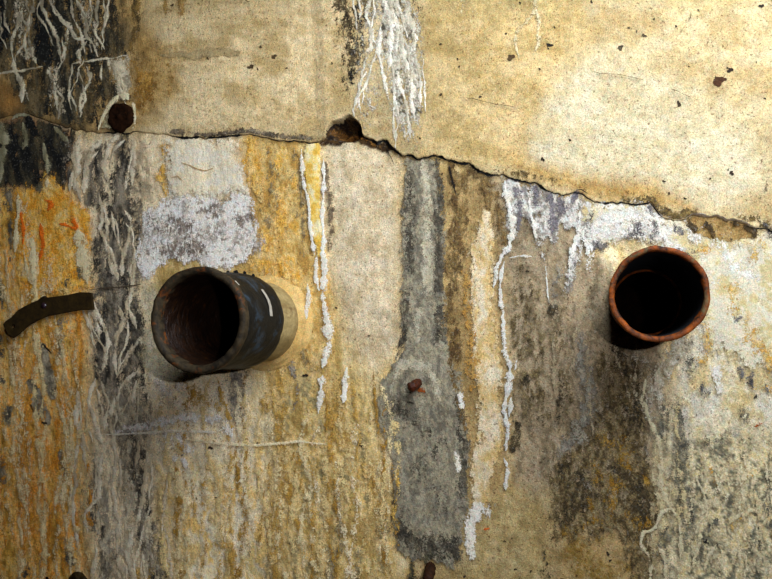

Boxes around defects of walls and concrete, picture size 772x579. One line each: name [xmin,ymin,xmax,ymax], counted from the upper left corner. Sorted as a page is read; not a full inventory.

rust [0,171,96,579]
leakage [0,0,335,579]
crack [170,134,322,144]
leakage [316,481,364,579]
crack [361,127,661,216]
leakage [331,0,772,579]